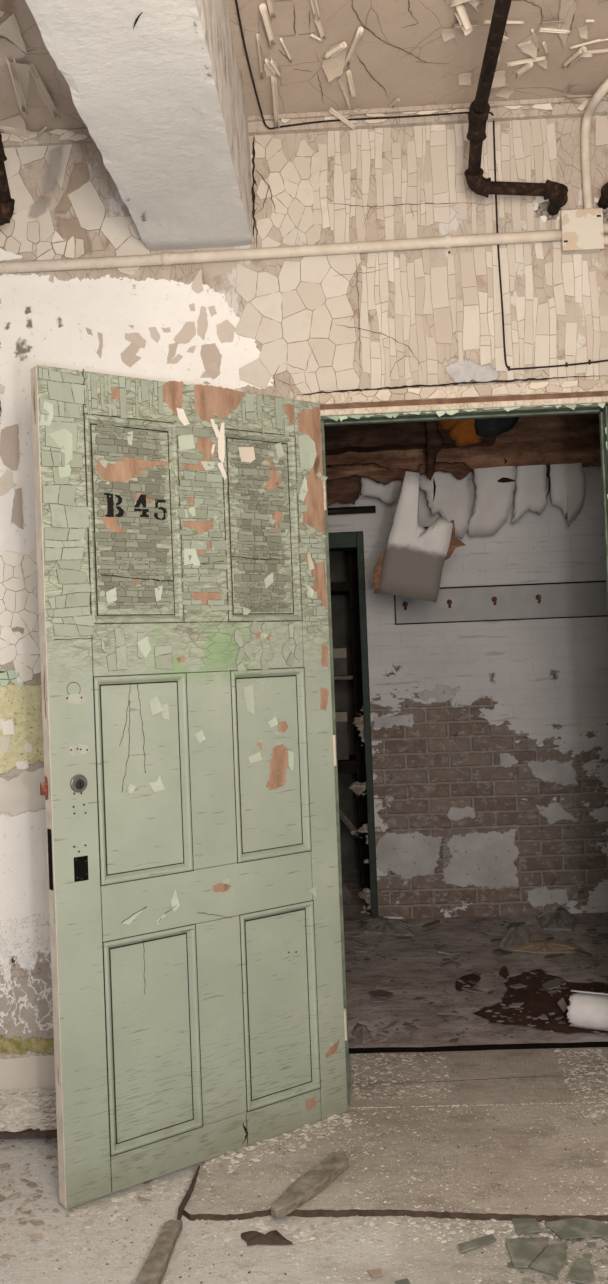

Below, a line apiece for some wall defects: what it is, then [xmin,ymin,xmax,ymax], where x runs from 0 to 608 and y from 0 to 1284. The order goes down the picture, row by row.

flaking render [0,10,274,636]
crack [0,138,591,689]
crack [279,0,324,104]
peeling [303,545,328,616]
peeling [242,0,608,537]
peeling [349,665,608,919]